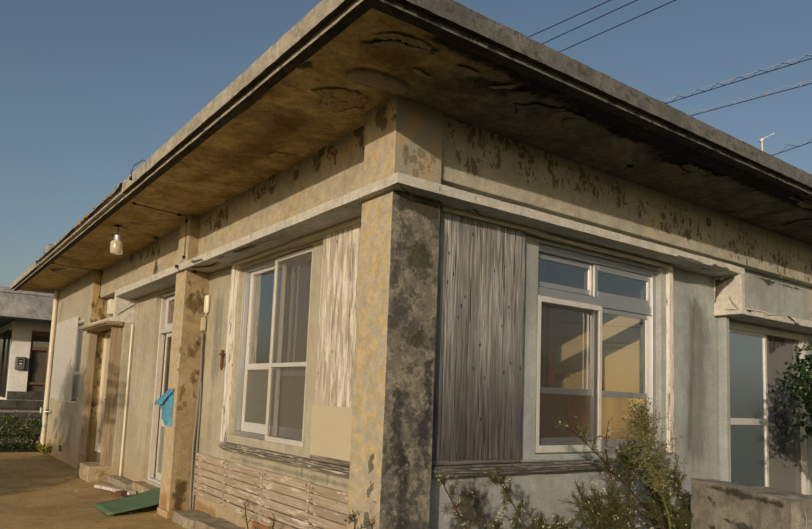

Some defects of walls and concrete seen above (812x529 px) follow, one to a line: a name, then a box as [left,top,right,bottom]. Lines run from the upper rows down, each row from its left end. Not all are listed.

water stain [408,243,430,272]
peeling [403,144,436,178]
water stain [424,35,812,212]
peeling [447,120,812,281]
water stain [390,389,409,529]
water stain [418,359,434,467]